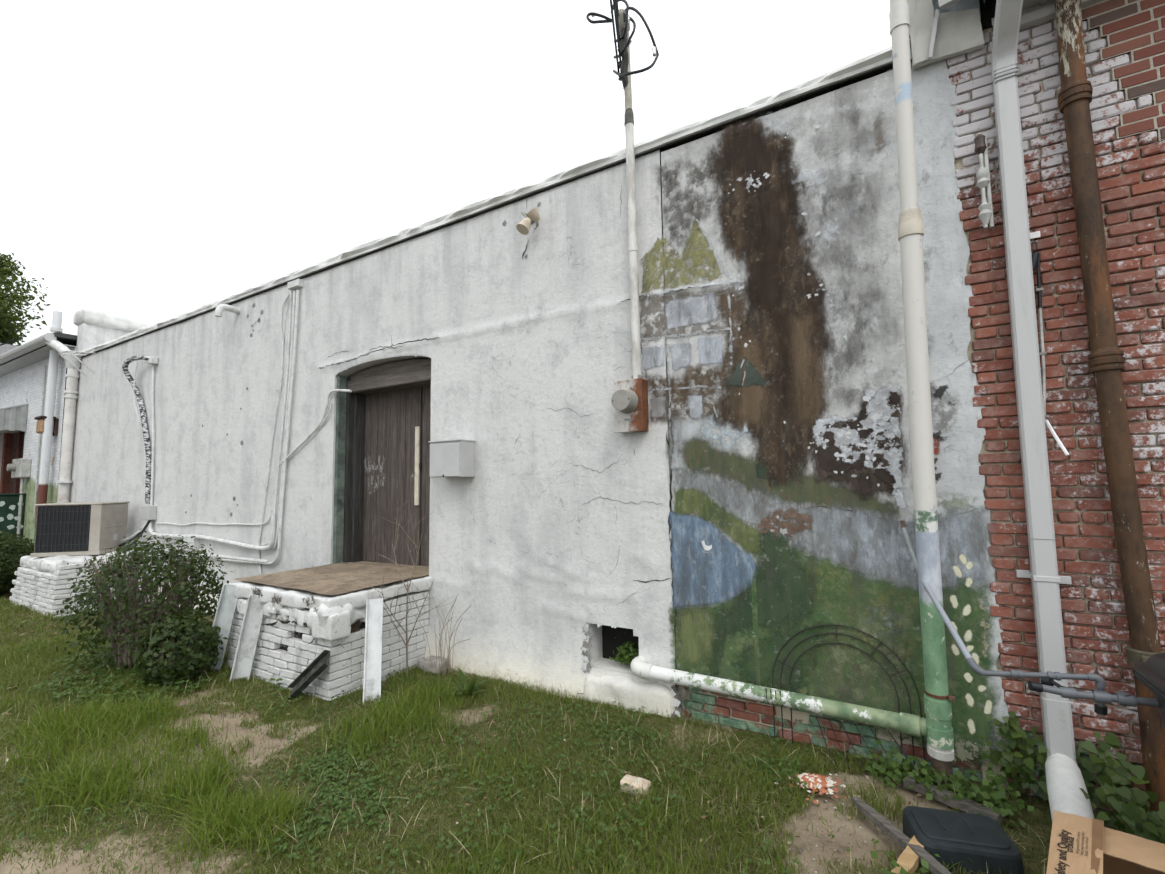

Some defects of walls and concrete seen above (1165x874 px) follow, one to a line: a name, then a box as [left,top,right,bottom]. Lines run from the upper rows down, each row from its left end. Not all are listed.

flaking render [581,622,616,673]
crack [548,341,683,701]
leakage [658,116,874,486]
peeling [808,386,908,516]